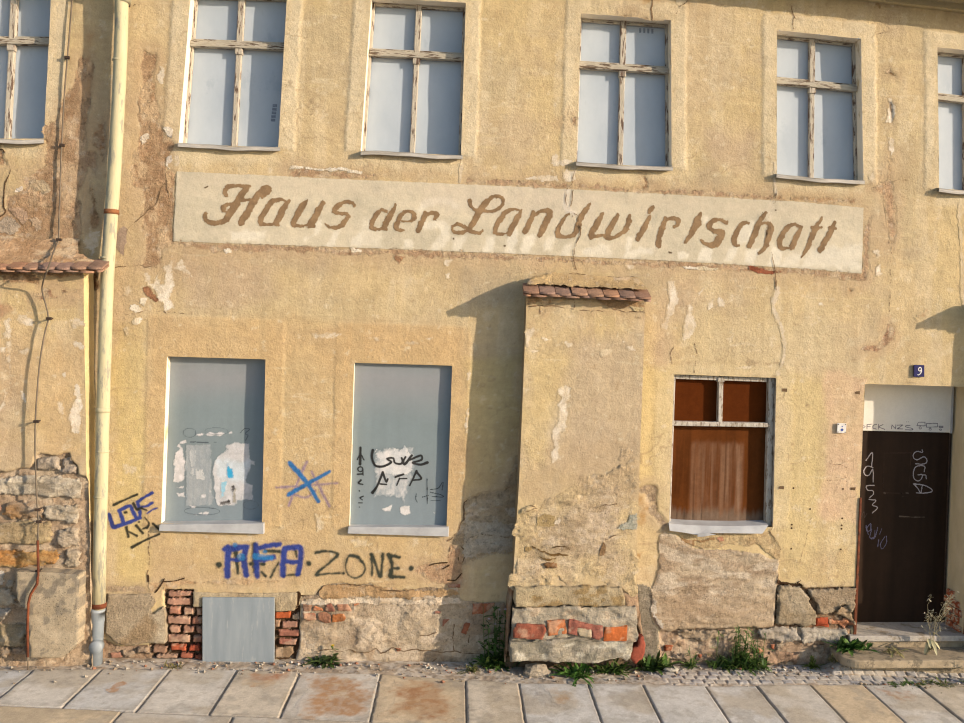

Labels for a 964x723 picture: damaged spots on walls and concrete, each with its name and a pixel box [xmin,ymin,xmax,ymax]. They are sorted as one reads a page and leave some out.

crack [0,169,11,217]
spalling [0,56,107,245]
spalling [122,49,897,342]
crack [565,168,634,278]
crack [530,302,637,314]
peeling [550,385,573,463]
flaking render [0,453,283,667]
spalling [414,446,667,597]
spalling [680,532,781,560]